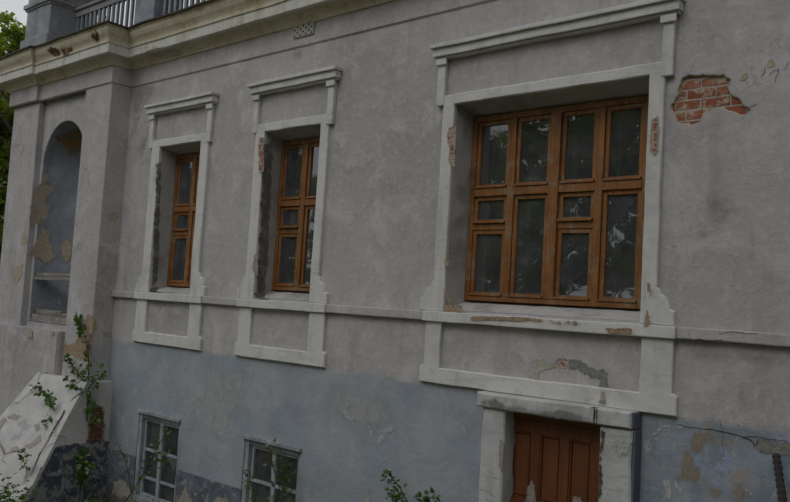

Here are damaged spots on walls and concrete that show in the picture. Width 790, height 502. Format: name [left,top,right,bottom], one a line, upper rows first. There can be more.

flaking render [669,73,751,126]
flaking render [447,125,456,167]
peeling [21,173,73,265]
flaking render [63,301,112,362]
spalling [443,289,463,313]
spalling [470,316,577,325]
flaking render [529,358,609,404]
crack [677,419,785,456]